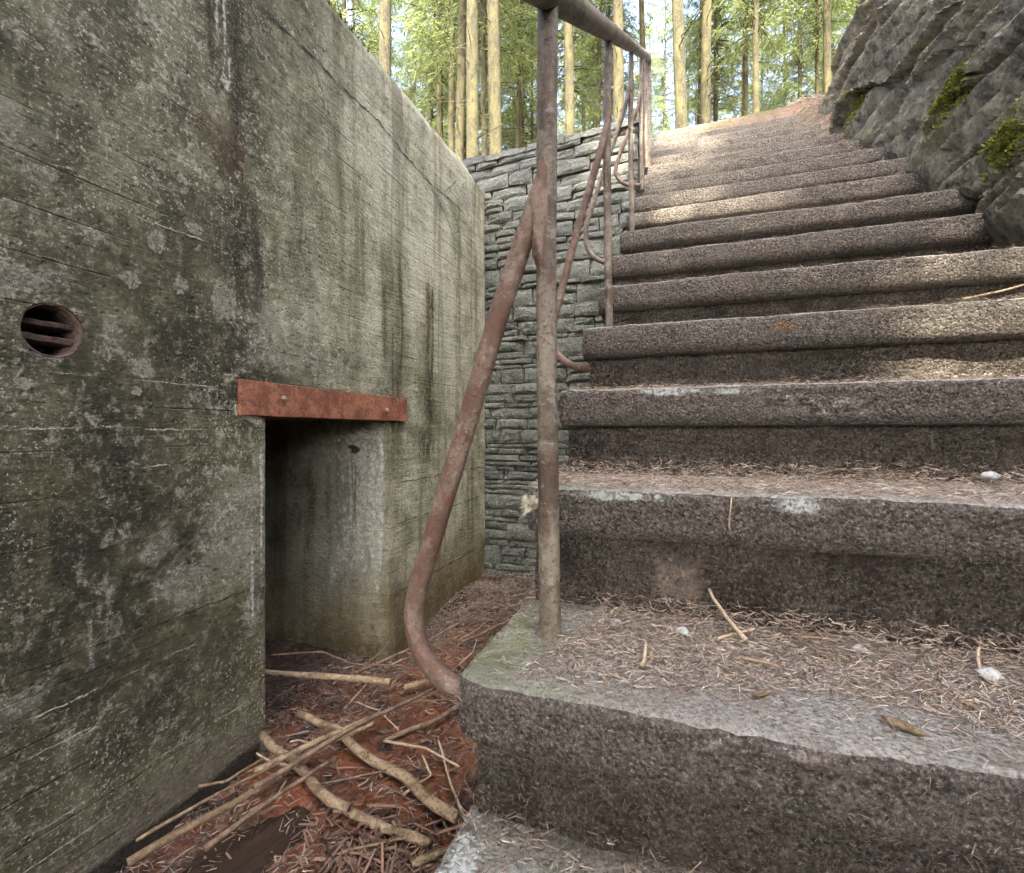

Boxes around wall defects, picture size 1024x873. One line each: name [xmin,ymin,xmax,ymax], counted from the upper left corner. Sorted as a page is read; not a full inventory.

damp [206,0,242,150]
crack [253,2,463,242]
damp [251,205,277,328]
damp [383,262,403,366]
damp [426,288,439,390]